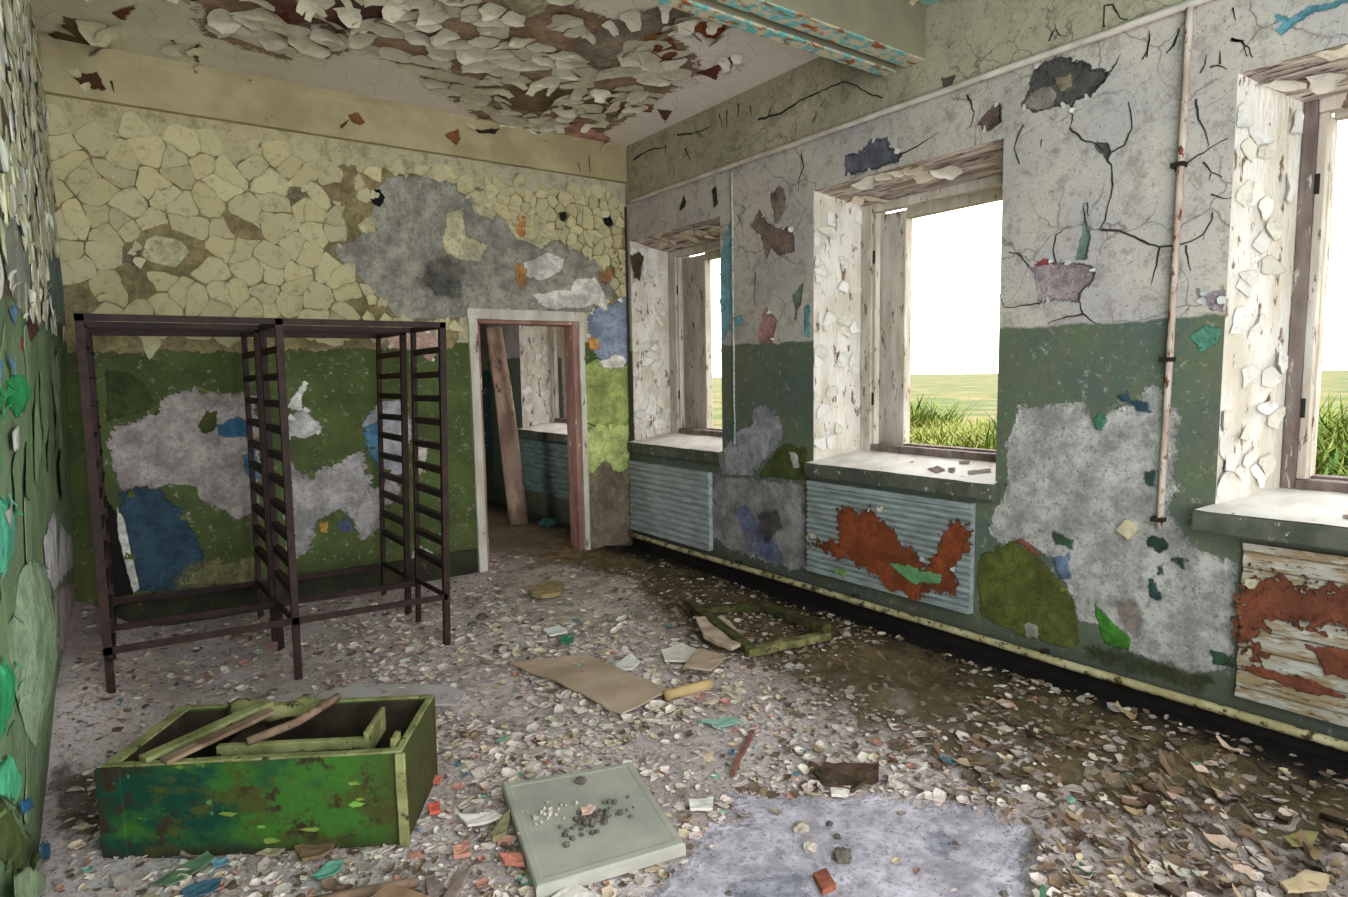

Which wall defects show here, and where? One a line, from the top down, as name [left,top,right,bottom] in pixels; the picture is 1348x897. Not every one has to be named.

flaking render [0,0,746,897]
peeling [750,186,795,259]
flaking render [712,385,843,573]
peeling [792,210,862,374]
peeling [844,137,963,225]
peeling [928,461,991,475]
crack [999,294,1096,324]
flaking render [976,383,1239,674]
crack [1009,4,1253,284]
peeling [1189,173,1298,353]
peeling [1217,410,1276,498]
peeling [1241,351,1288,430]